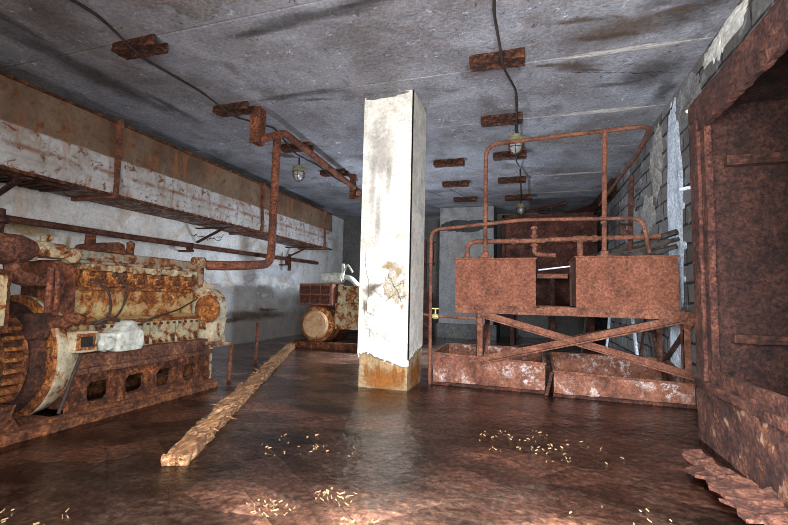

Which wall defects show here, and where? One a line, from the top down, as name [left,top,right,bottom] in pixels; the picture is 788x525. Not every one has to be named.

leakage [564,40,691,59]
flaking render [624,0,749,310]